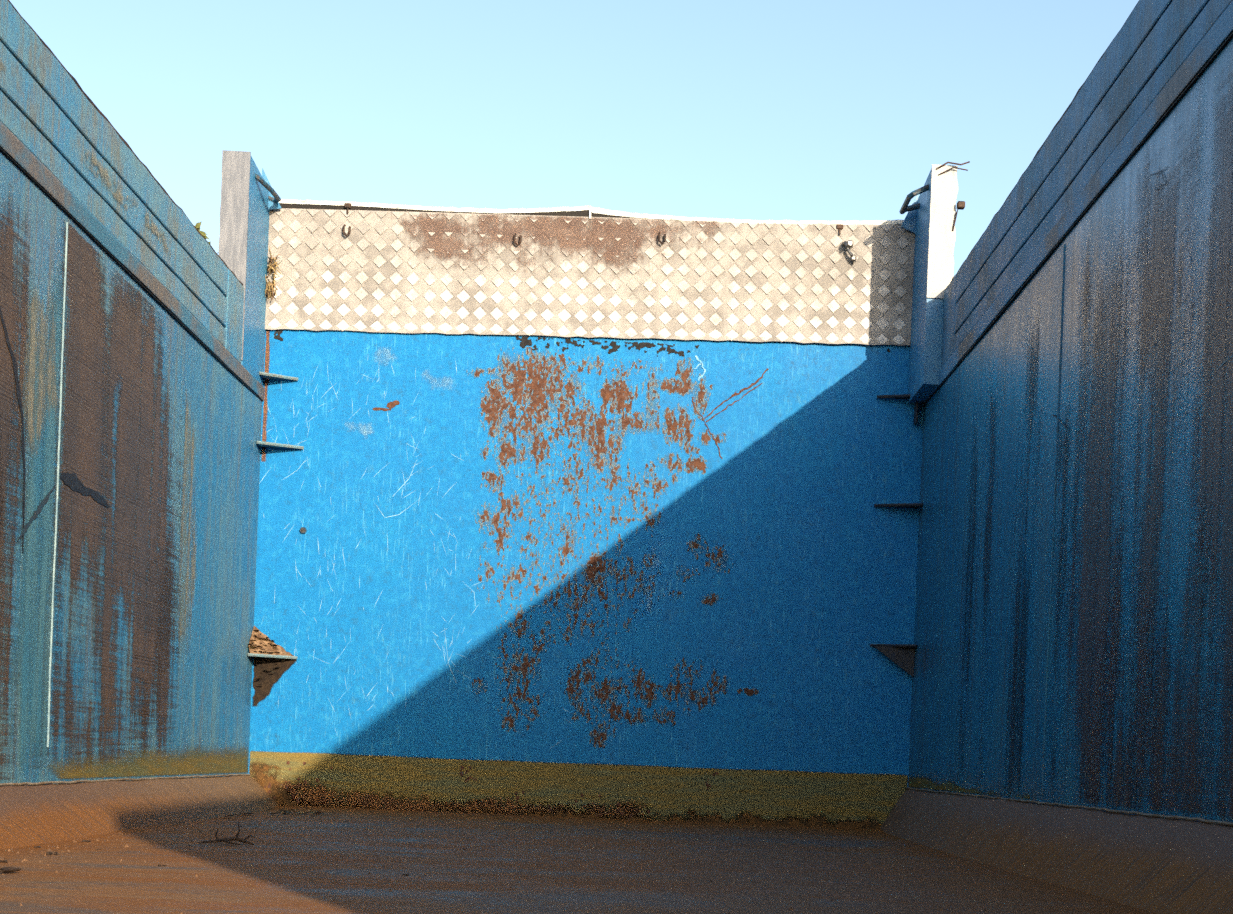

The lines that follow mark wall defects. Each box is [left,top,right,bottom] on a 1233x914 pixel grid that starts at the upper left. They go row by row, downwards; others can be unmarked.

peeling [86,152,168,251]
corrosion [403,214,678,266]
leakage [53,751,997,826]